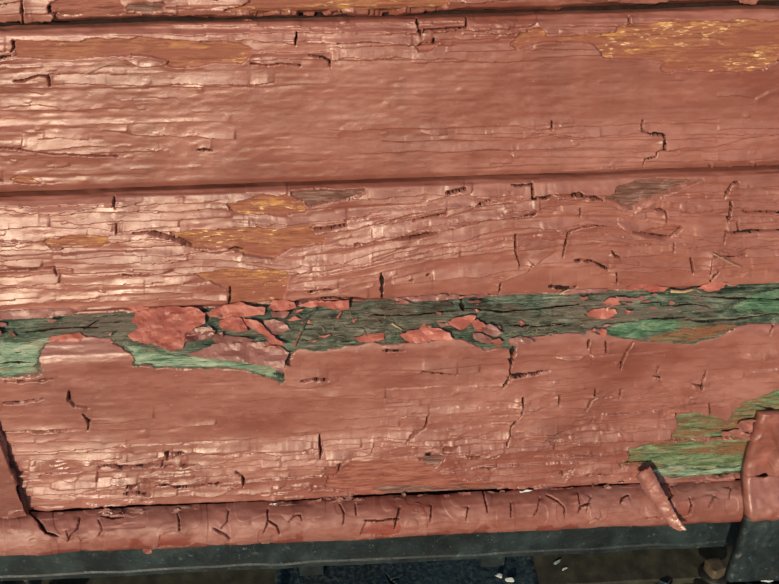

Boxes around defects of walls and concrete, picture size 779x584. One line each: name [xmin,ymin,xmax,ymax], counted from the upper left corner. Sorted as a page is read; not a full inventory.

peeling [12,36,251,72]
peeling [511,19,779,76]
peeling [0,184,779,384]
crack [374,273,579,328]
crack [511,183,551,266]
crack [562,192,618,282]
peeling [605,174,708,208]
crack [643,208,779,326]
crack [503,346,547,387]
peeling [0,440,25,519]
crack [319,434,341,472]
peeling [617,390,779,531]